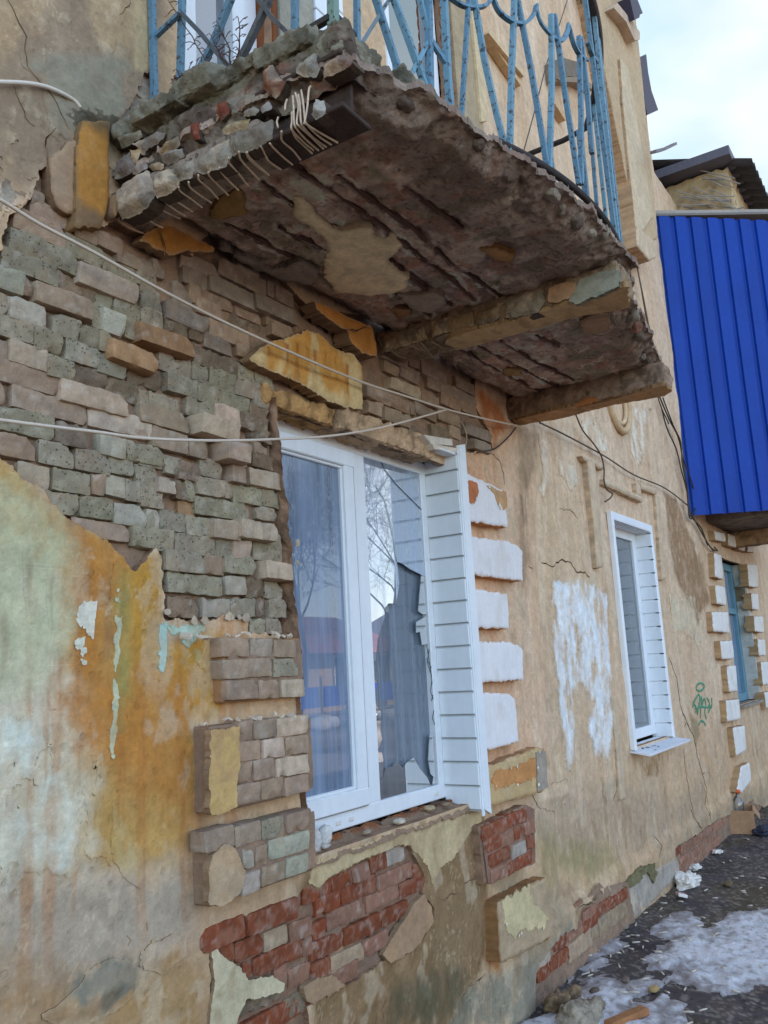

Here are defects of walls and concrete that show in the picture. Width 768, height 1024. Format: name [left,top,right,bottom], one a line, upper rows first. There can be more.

crack [8,0,69,164]
spalling [544,187,631,274]
flaking render [0,23,545,701]
spalling [460,340,575,392]
leakage [0,461,96,719]
leakage [106,560,138,738]
crack [528,559,589,577]
crack [669,658,712,829]
flaking render [190,806,536,1024]
flaking render [535,882,635,1007]